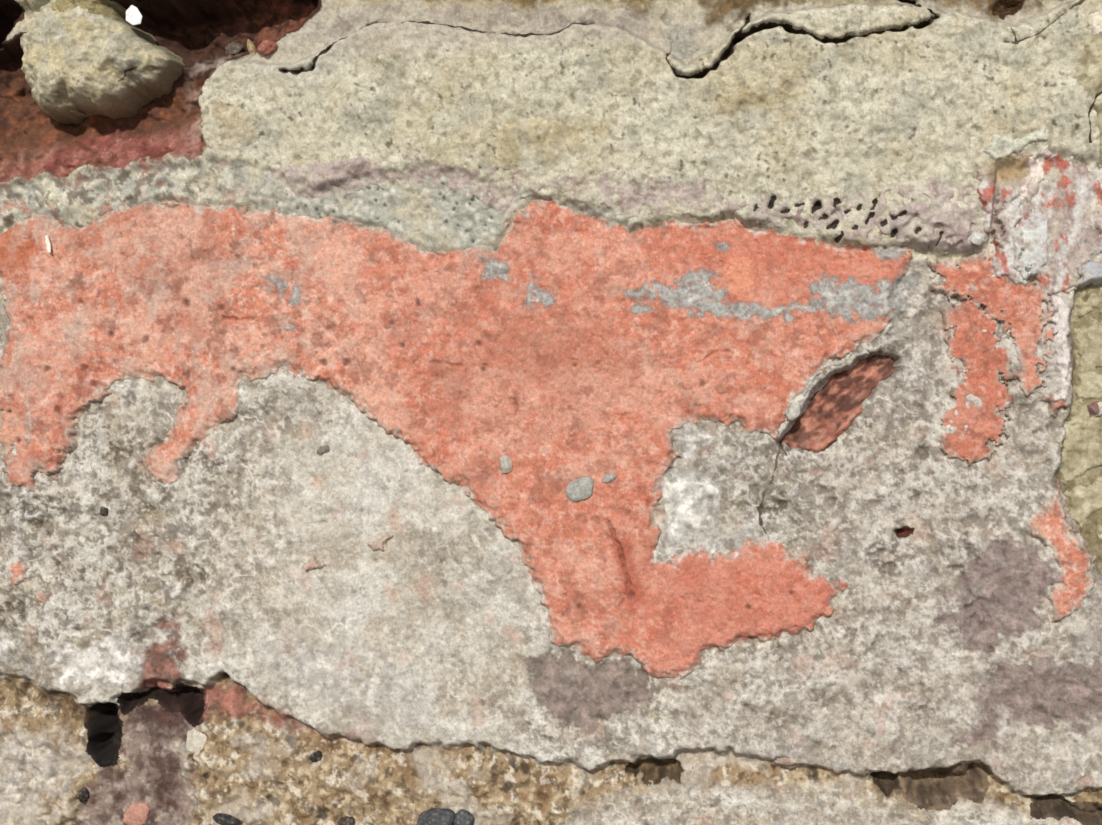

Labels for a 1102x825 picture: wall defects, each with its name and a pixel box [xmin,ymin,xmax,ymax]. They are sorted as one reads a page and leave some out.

peeling [126,5,142,25]
crack [279,21,595,75]
crack [665,4,940,79]
crack [1088,91,1102,143]
peeling [624,269,794,323]
peeling [1073,319,1102,417]
spalling [966,394,982,409]
peeling [1064,477,1102,528]
spalling [894,525,915,538]
spalling [62,663,145,705]
spalling [168,648,238,686]
spalling [511,700,683,771]